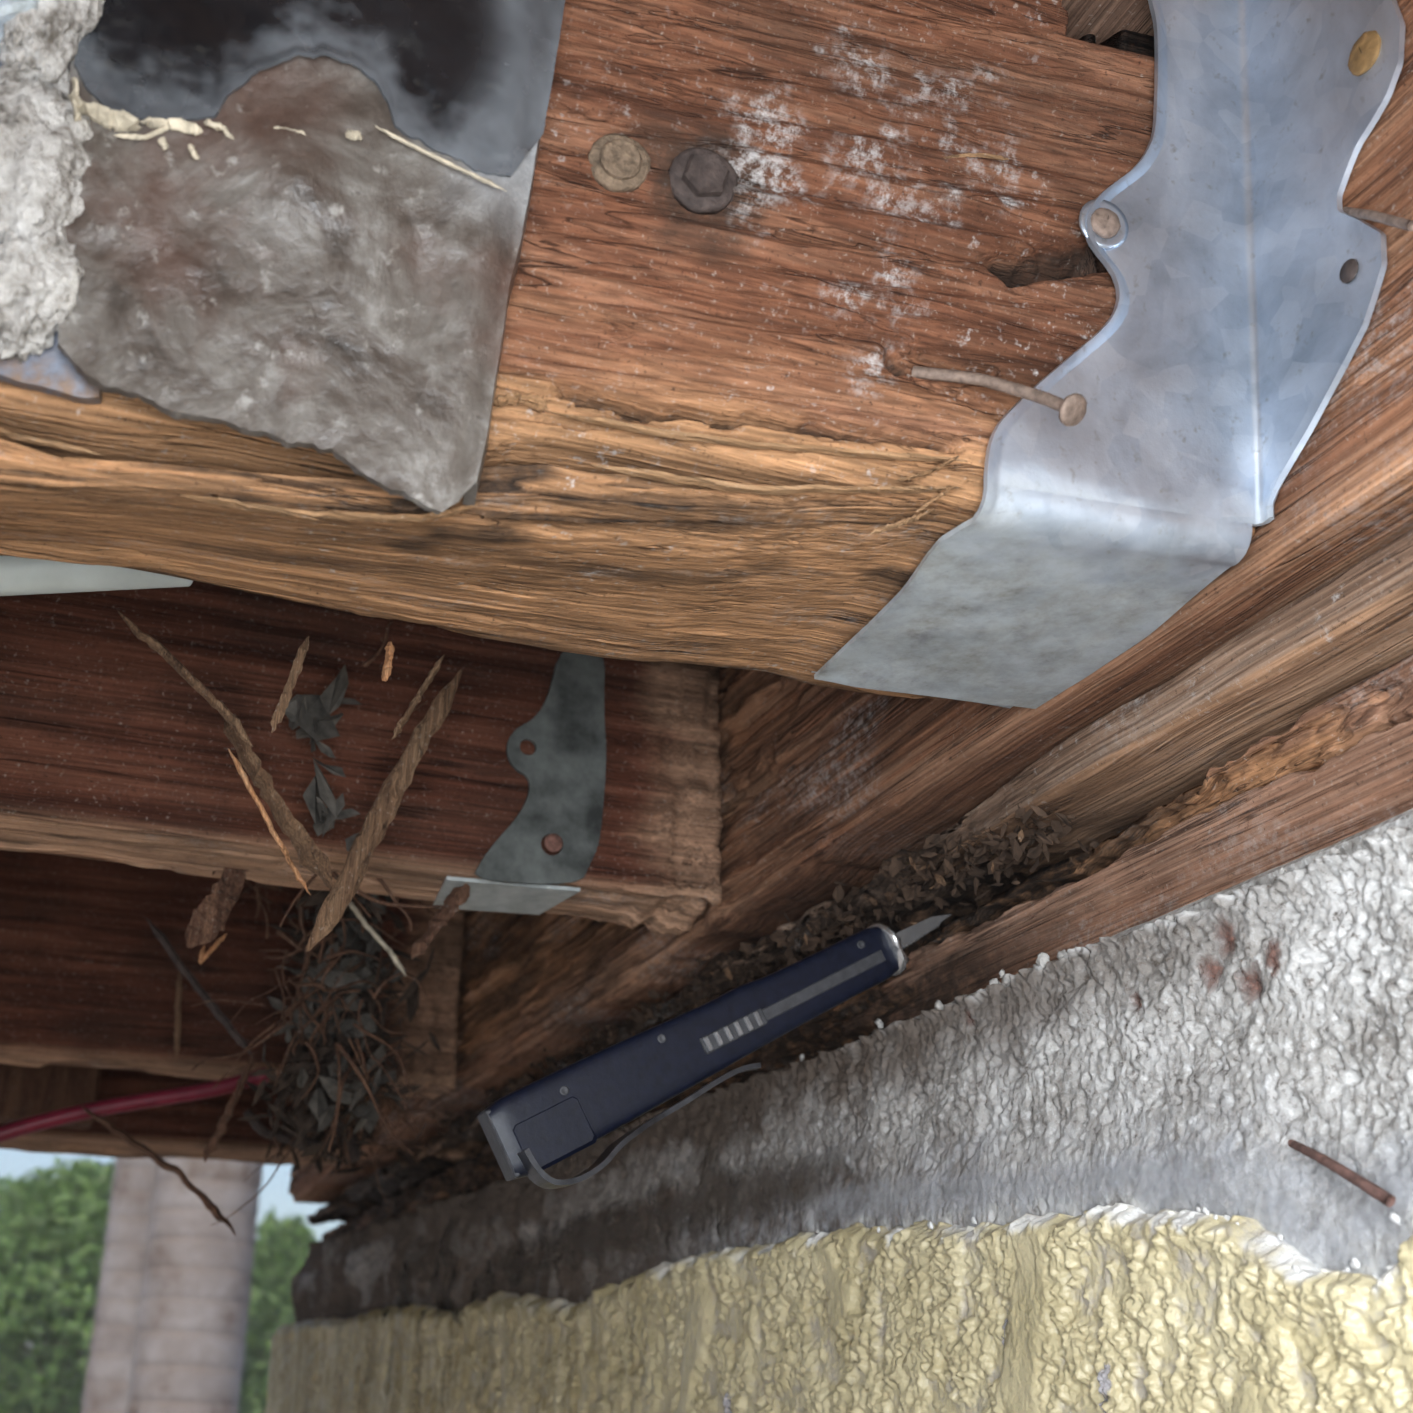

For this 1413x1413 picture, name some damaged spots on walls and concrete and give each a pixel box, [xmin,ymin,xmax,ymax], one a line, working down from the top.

spalling [1036,949,1068,968]
spalling [989,969,1011,988]
spalling [1196,1206,1239,1225]
spalling [1343,1258,1379,1279]